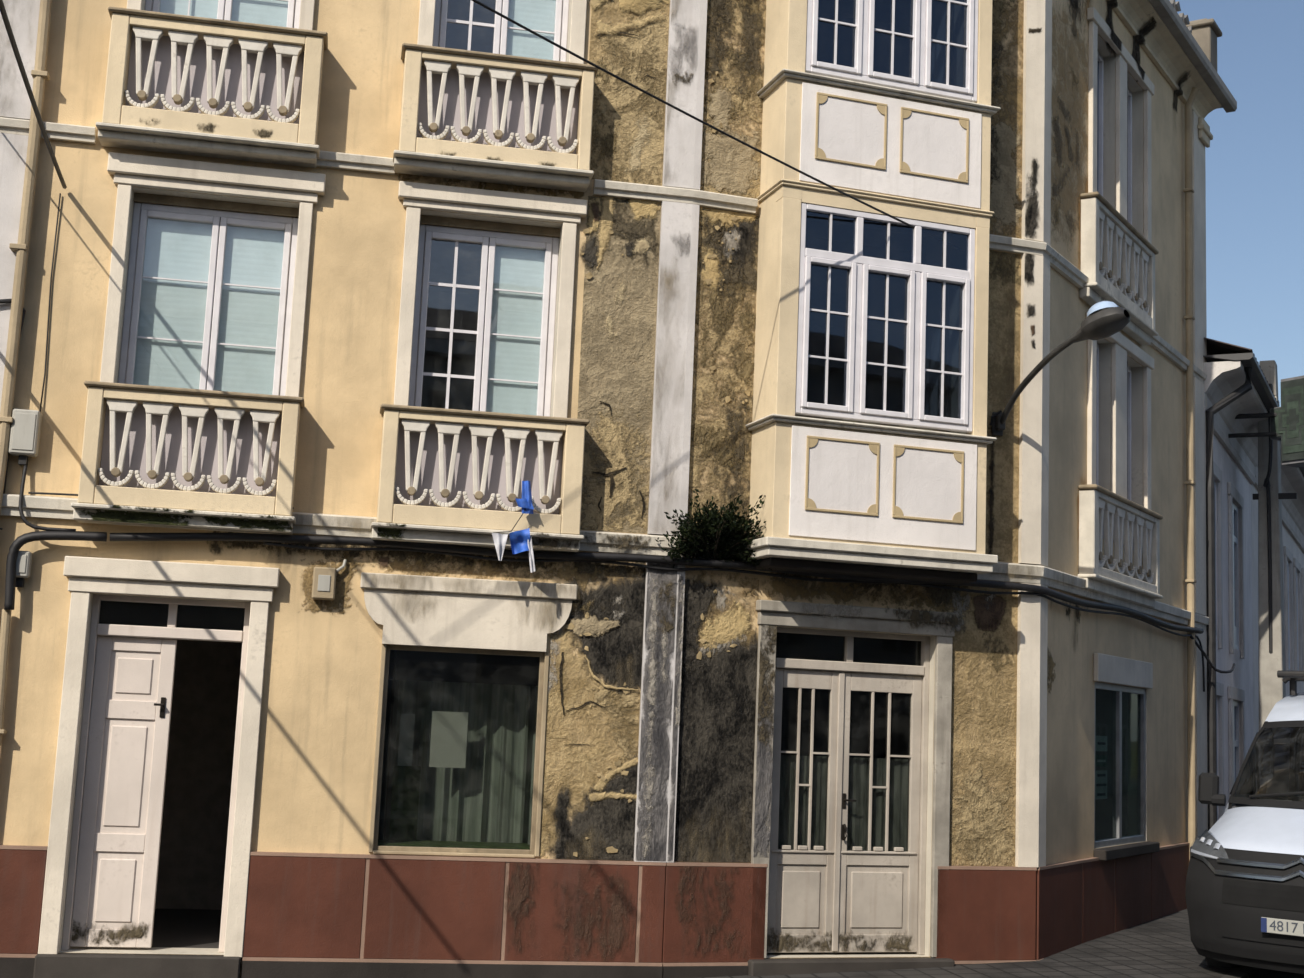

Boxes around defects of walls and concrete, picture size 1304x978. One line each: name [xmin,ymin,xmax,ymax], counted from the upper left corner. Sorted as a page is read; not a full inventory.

leakage [1069,0,1090,36]
leakage [398,173,660,279]
leakage [672,0,766,532]
leakage [985,0,1024,563]
leakage [203,514,758,921]
flaking render [539,629,641,858]
crack [559,652,638,745]
peeling [686,571,777,857]
spalling [972,594,1006,632]